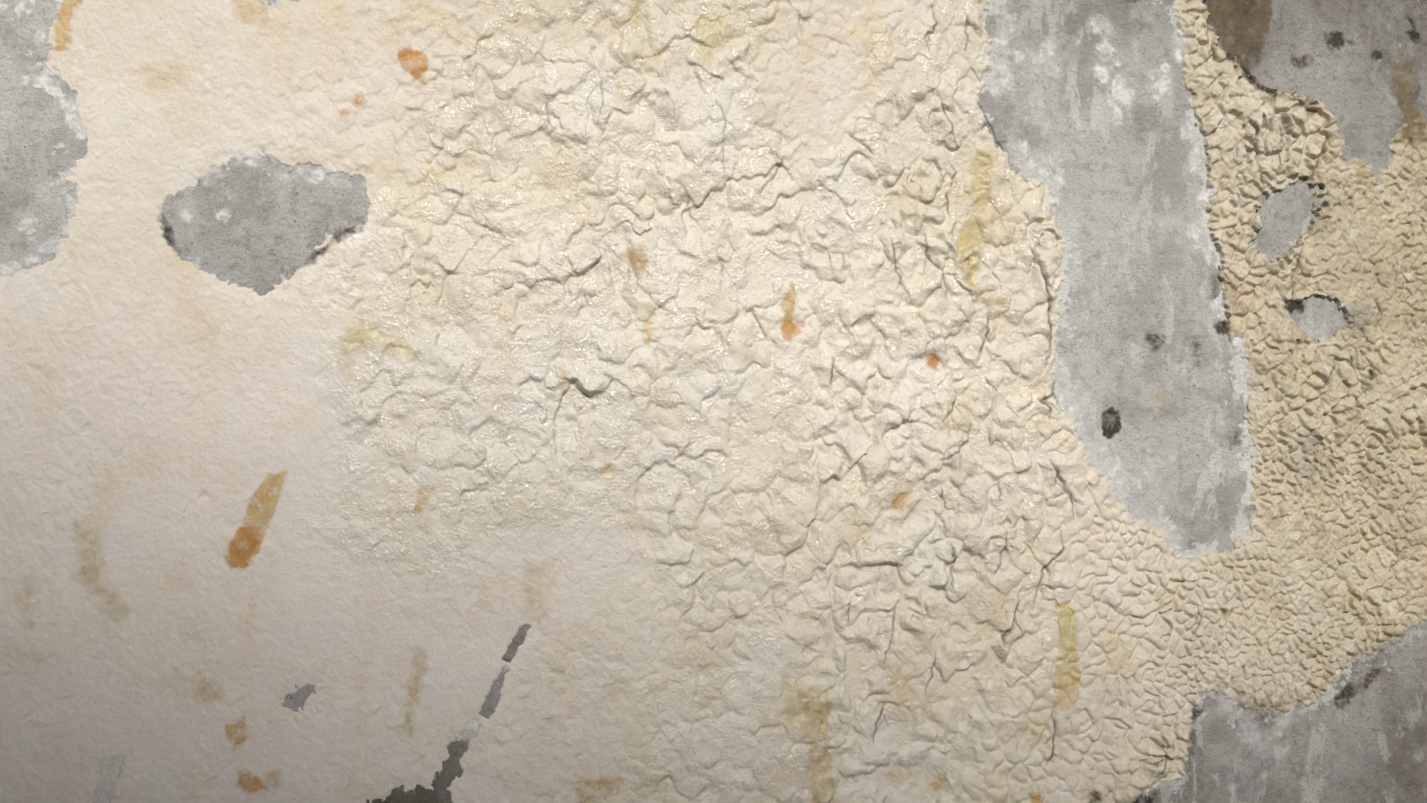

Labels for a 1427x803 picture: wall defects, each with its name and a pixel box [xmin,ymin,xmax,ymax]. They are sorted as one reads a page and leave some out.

corrosion [399,49,427,82]
leakage [1207,0,1277,93]
peeling [0,0,88,275]
peeling [157,150,370,296]
corrosion [781,284,797,339]
crack [376,0,1352,803]
peeling [977,0,1427,803]
corrosion [226,473,284,568]
peeling [279,684,316,712]
peeling [479,624,531,719]
peeling [366,740,468,803]